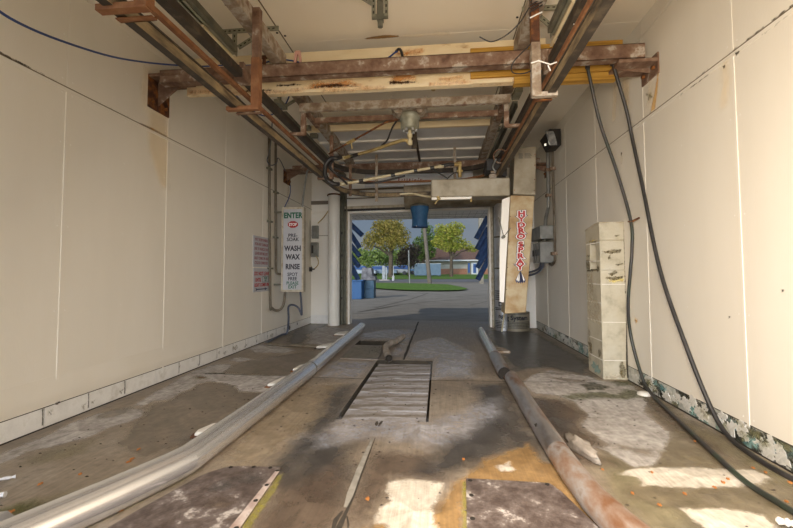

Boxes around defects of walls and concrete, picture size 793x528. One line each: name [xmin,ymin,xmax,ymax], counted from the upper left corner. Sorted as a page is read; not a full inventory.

water stain [0,324,350,463]
peeling [631,374,793,472]